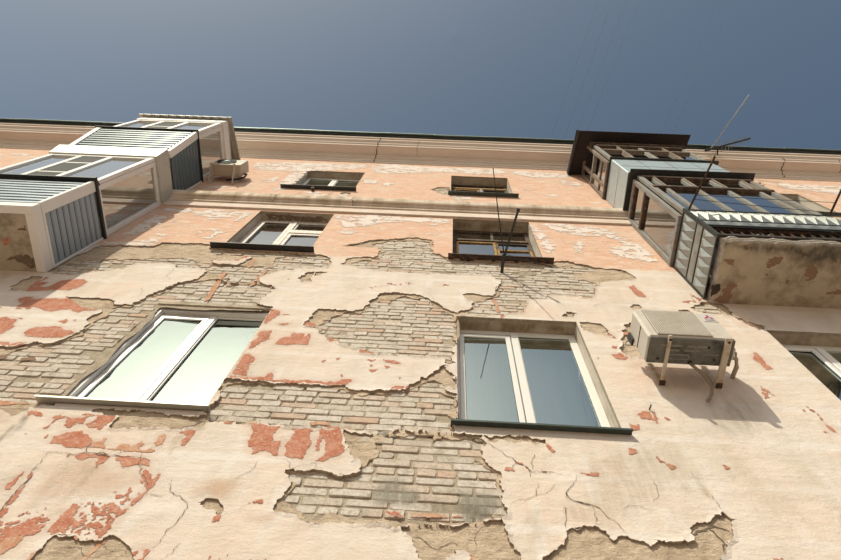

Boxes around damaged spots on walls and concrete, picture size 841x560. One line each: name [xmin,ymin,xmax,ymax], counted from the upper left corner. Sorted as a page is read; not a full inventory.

spalling [679,282,767,330]
spalling [0,208,660,560]
peeling [753,352,773,369]
peeling [629,411,670,430]
crack [0,443,188,555]
crack [494,447,659,529]
spalling [543,515,733,560]
crack [692,495,730,553]